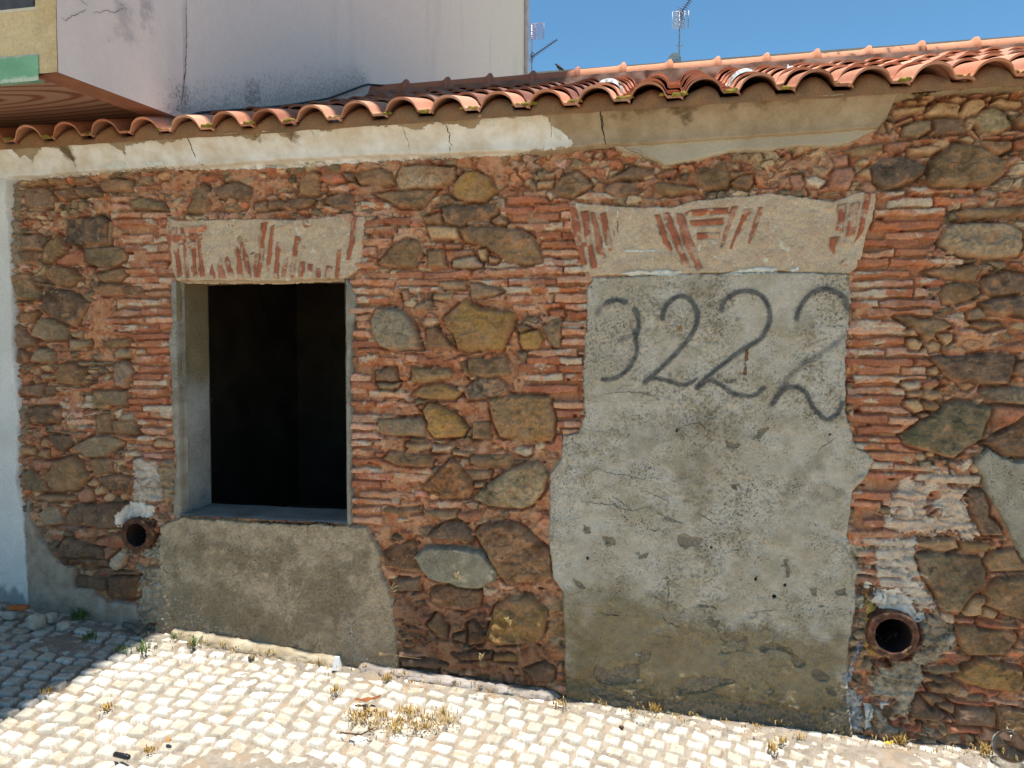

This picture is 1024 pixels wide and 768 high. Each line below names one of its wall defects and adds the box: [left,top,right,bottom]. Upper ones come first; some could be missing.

crack [180,1,188,103]
peeling [0,115,573,181]
crack [600,112,647,159]
corrosion [882,619,924,670]